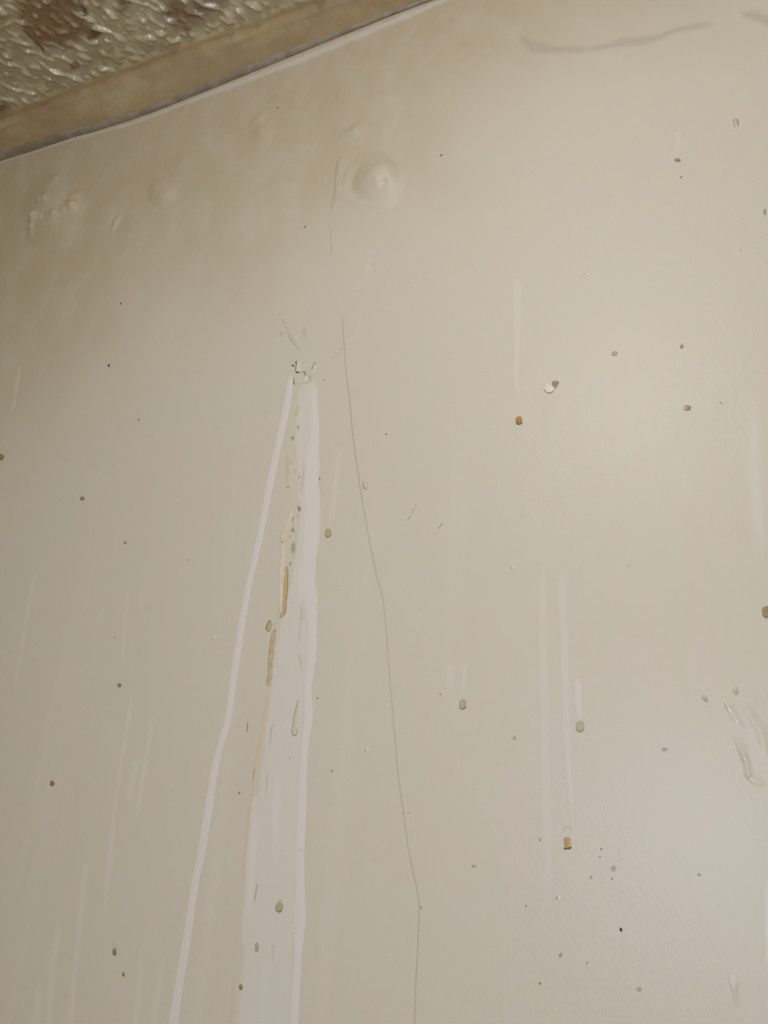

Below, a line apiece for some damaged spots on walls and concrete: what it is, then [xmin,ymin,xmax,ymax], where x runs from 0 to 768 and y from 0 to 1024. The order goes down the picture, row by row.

damp [17,0,101,51]
damp [131,371,321,1024]
crack [330,298,420,1024]